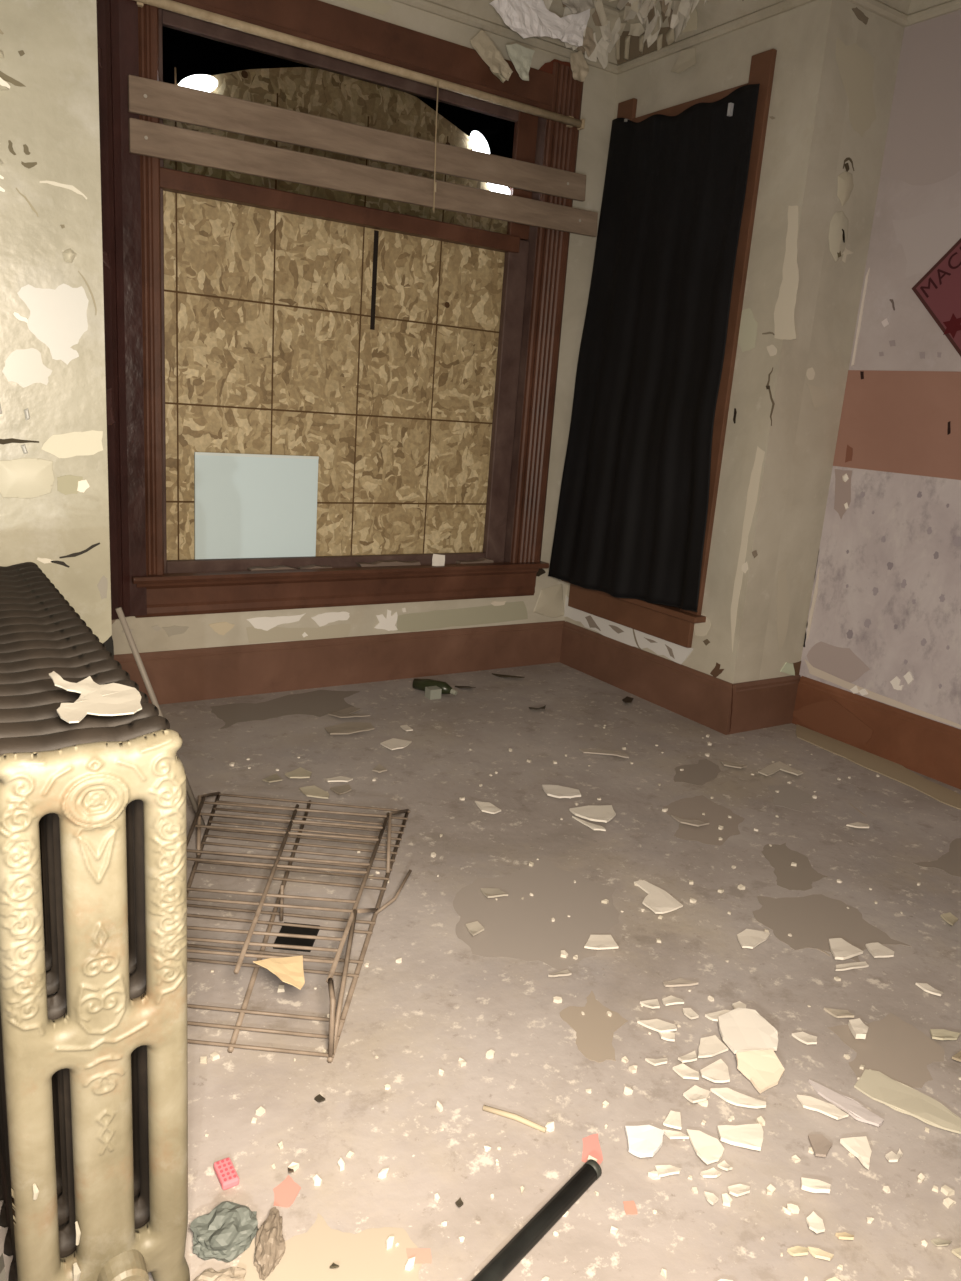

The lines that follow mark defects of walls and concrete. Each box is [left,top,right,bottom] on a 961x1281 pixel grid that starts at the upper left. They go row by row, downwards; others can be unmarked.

peeling [470,0,706,83]
peeling [767,205,799,356]
crack [766,368,775,426]
crack [0,437,39,445]
peeling [42,430,103,458]
peeling [57,475,90,495]
flaking render [209,611,351,643]
peeling [374,608,406,631]